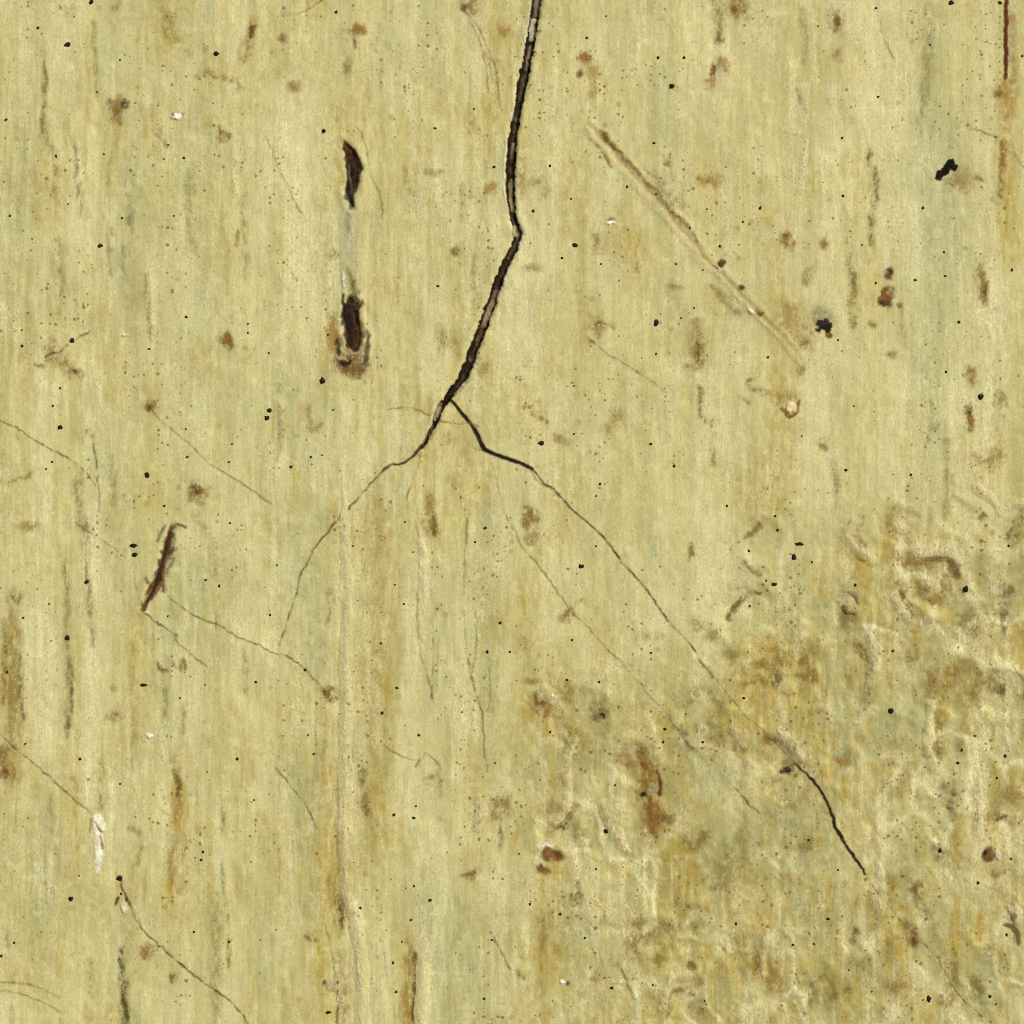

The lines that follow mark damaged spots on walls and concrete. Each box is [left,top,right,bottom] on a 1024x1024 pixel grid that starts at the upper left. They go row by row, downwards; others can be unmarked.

crack [383,0,668,621]
crack [797,765,866,875]